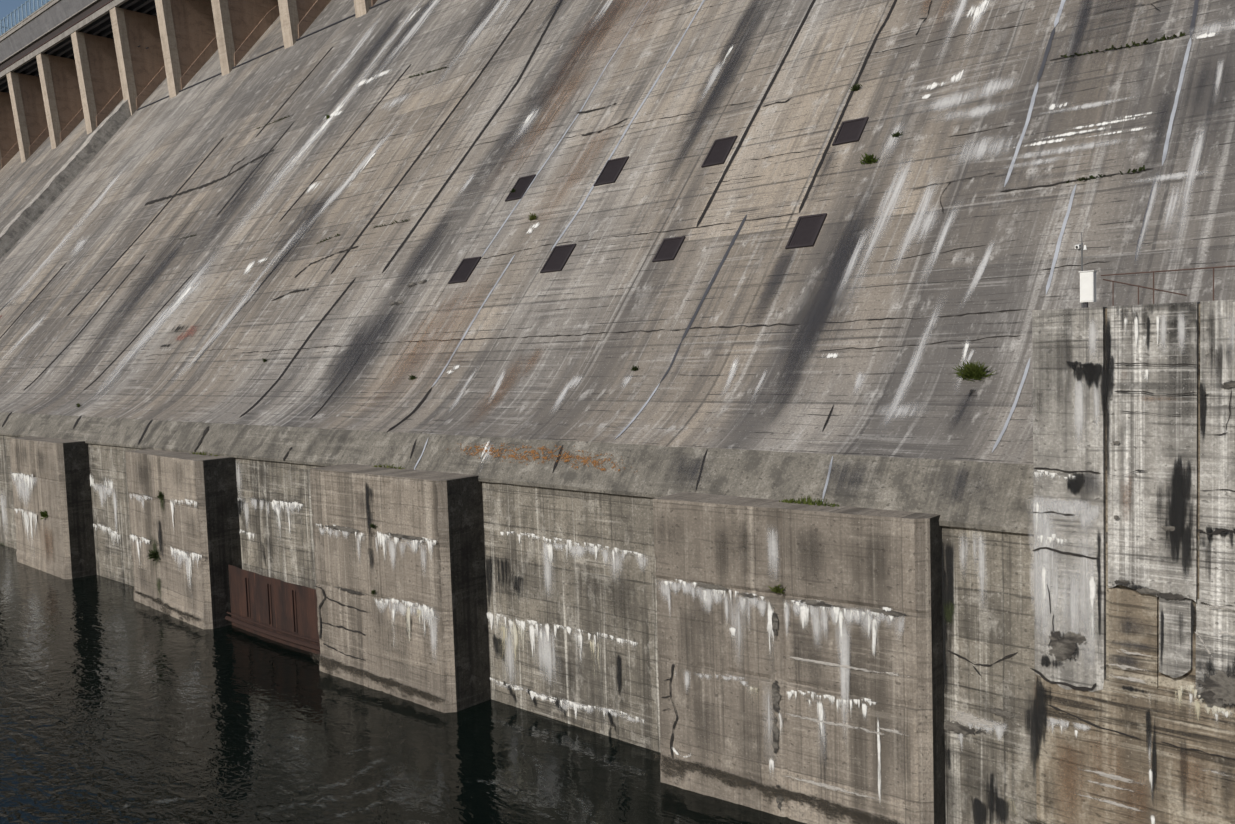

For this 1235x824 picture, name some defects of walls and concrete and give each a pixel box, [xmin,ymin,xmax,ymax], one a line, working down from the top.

water stain [1,473,37,546]
water stain [90,475,202,576]
water stain [237,466,302,564]
water stain [500,531,645,586]
water stain [1034,306,1235,636]
crack [314,586,366,660]
water stain [376,598,436,645]
water stain [485,558,644,737]
crack [662,664,688,759]
water stain [655,579,902,824]